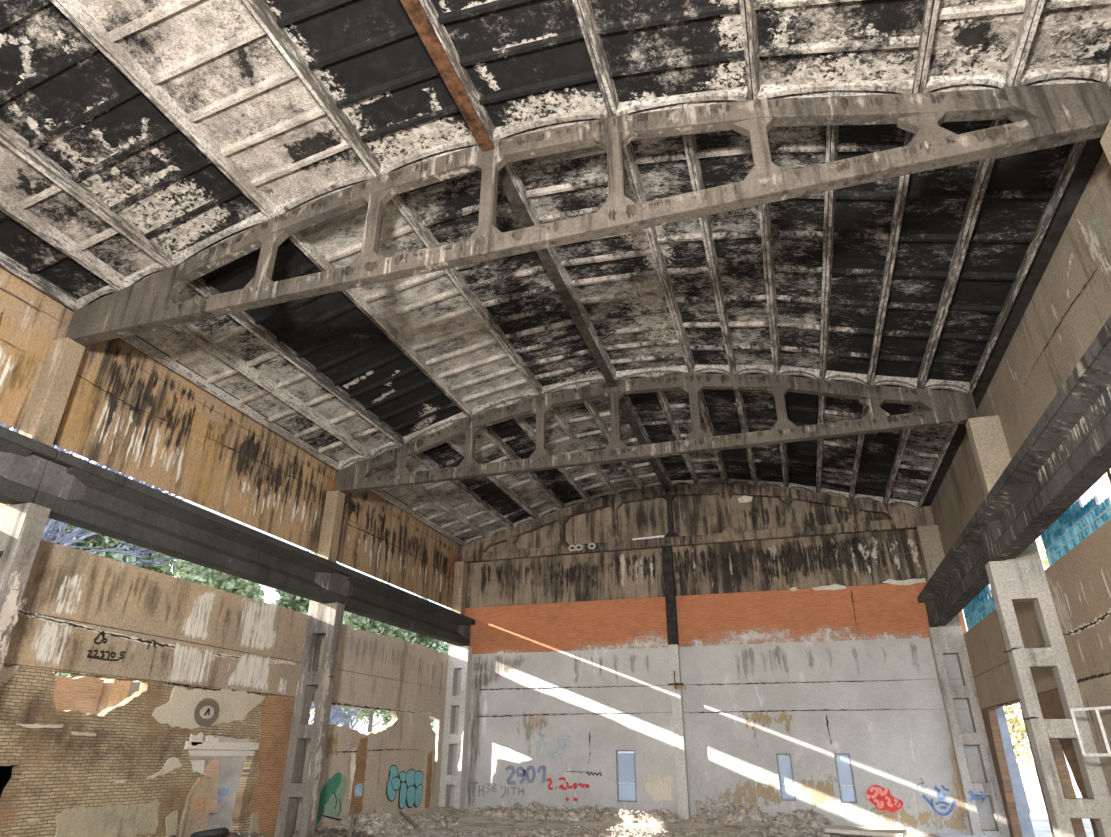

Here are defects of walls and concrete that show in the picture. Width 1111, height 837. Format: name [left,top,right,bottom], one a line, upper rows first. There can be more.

peeling [0,33,36,91]
peeling [42,22,84,54]
peeling [8,97,230,256]
water stain [61,342,233,501]
water stain [235,428,326,534]
water stain [480,537,921,597]
crack [17,607,295,665]
water stain [151,590,287,695]
crack [1066,608,1111,636]
crack [166,682,277,695]
crack [1077,672,1111,682]
spalling [152,686,293,835]